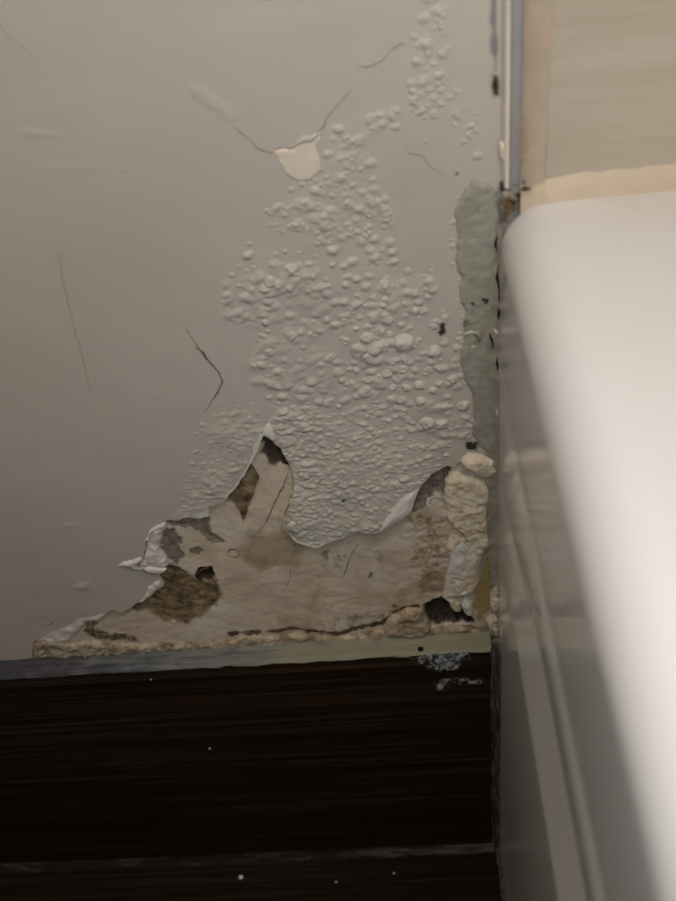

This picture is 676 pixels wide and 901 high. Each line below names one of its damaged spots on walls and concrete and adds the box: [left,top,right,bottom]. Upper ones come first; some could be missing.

spalling [274,129,323,181]
crack [187,331,223,410]
flaking render [33,404,499,658]